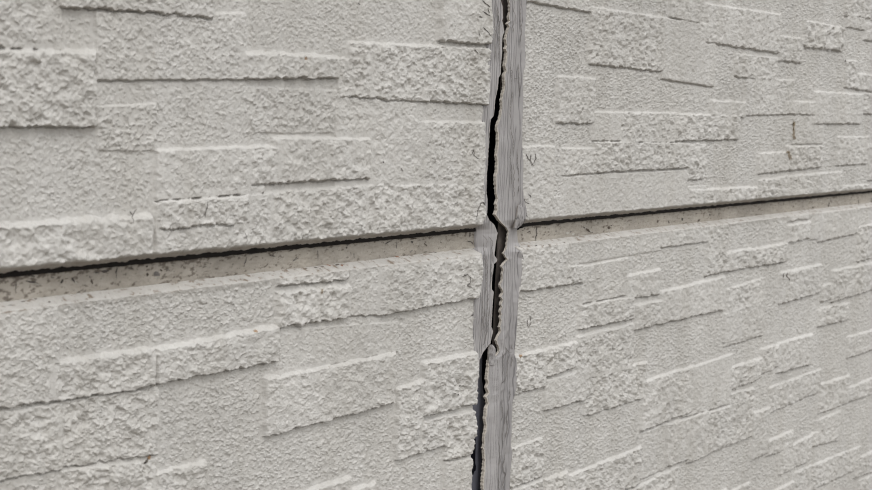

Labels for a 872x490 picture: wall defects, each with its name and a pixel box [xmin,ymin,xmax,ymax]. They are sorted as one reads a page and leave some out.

crack [462,0,537,490]